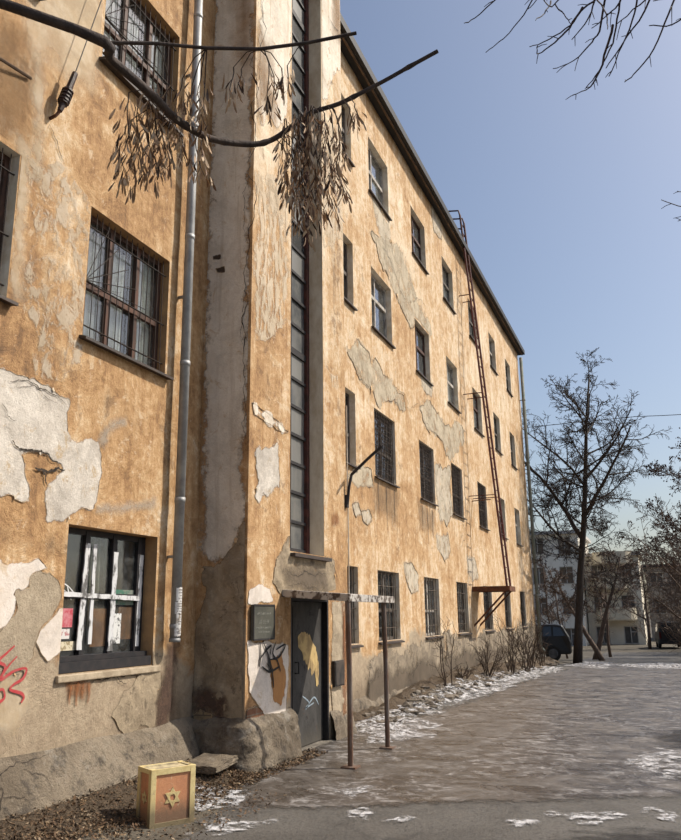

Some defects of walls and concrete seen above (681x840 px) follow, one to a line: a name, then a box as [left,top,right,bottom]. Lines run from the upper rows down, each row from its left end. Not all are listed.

peeling [322,0,340,100]
crack [240,2,267,438]
peeling [322,113,343,247]
peeling [0,157,102,522]
peeling [192,0,336,720]
flaking render [420,376,464,563]
flaking render [0,558,63,677]
rust [69,681,91,705]
damp [156,635,181,727]
damp [194,689,226,718]
flaking render [331,601,346,661]
crack [0,754,52,811]